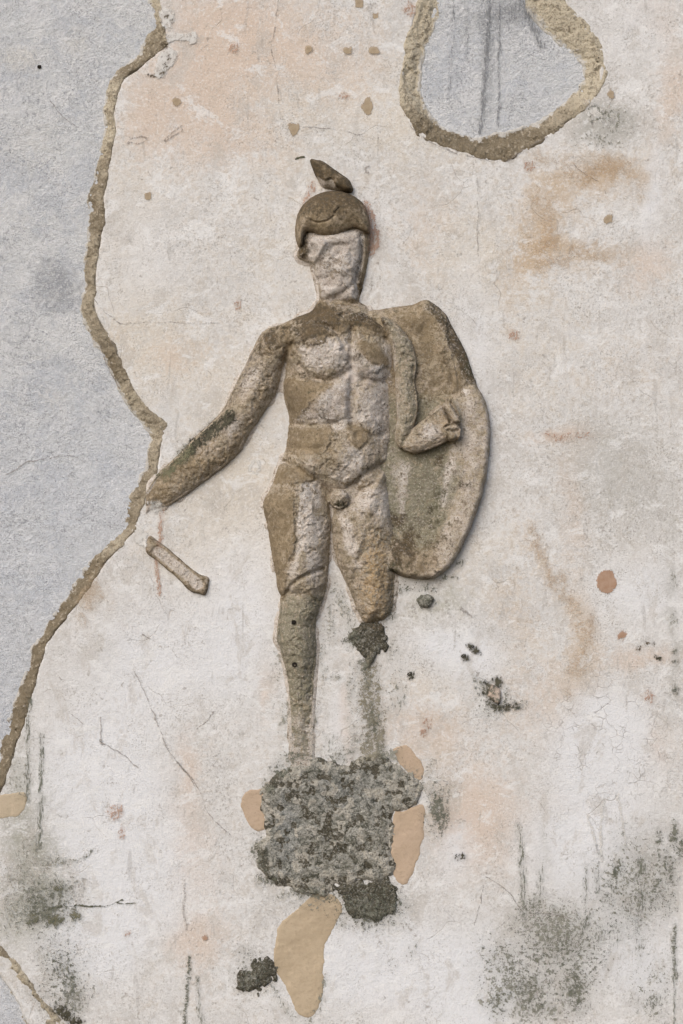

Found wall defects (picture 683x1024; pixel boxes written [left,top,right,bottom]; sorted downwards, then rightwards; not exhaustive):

spalling [574,90,627,150]
damp [2,698,99,1023]
damp [477,793,683,1023]